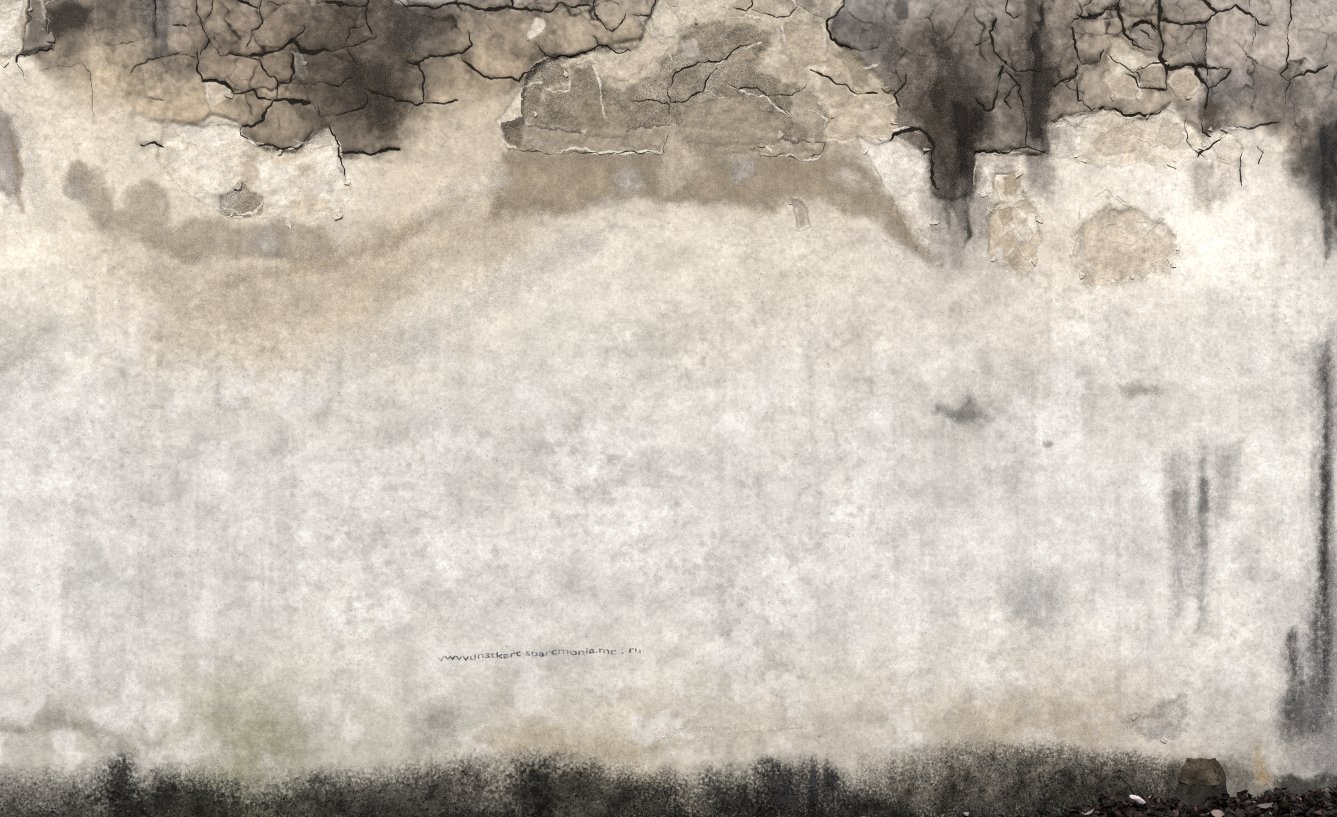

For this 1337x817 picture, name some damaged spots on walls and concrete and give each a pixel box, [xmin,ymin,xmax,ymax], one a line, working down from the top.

flaking render [0,0,55,67]
crack [15,47,93,112]
flaking render [156,78,353,230]
crack [120,0,679,175]
water stain [394,125,927,258]
flaking render [495,0,940,258]
crack [520,0,939,190]
flaking render [973,23,1242,287]
crack [974,0,1328,185]
water stain [1292,119,1337,243]
water stain [1218,340,1337,800]
water stain [0,745,1182,817]